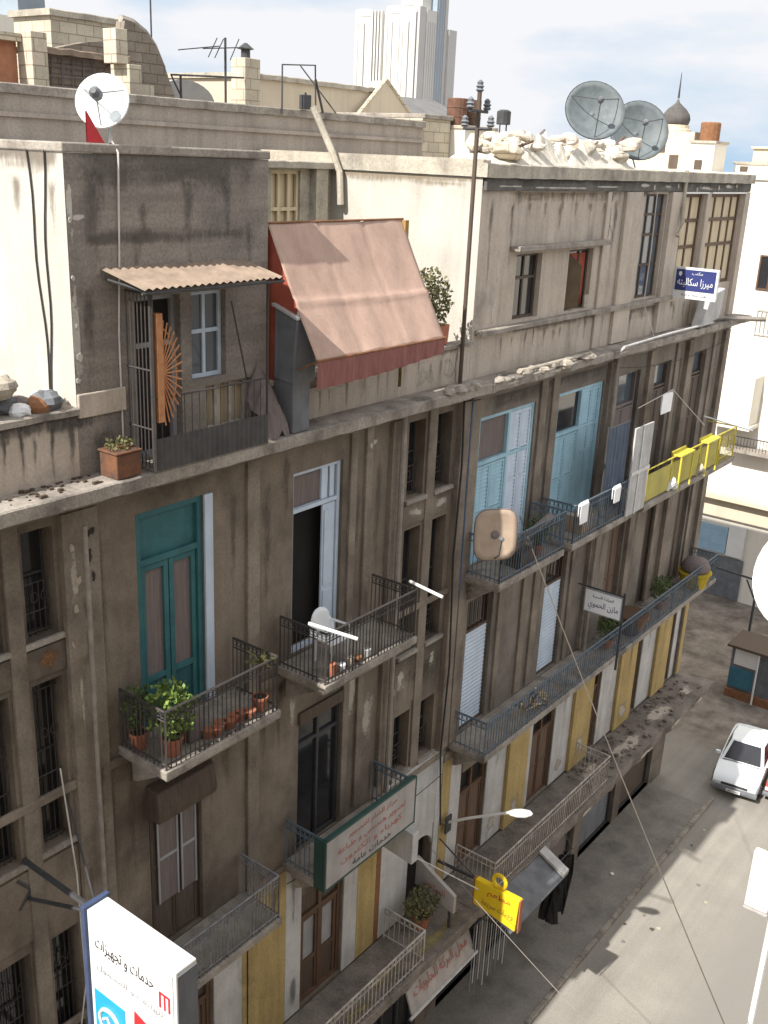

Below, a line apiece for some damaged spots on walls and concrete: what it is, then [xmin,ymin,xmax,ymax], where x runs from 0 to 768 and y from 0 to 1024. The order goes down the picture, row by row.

leakage [0,416,87,468]
peeling [69,527,96,613]
peeling [349,679,372,735]